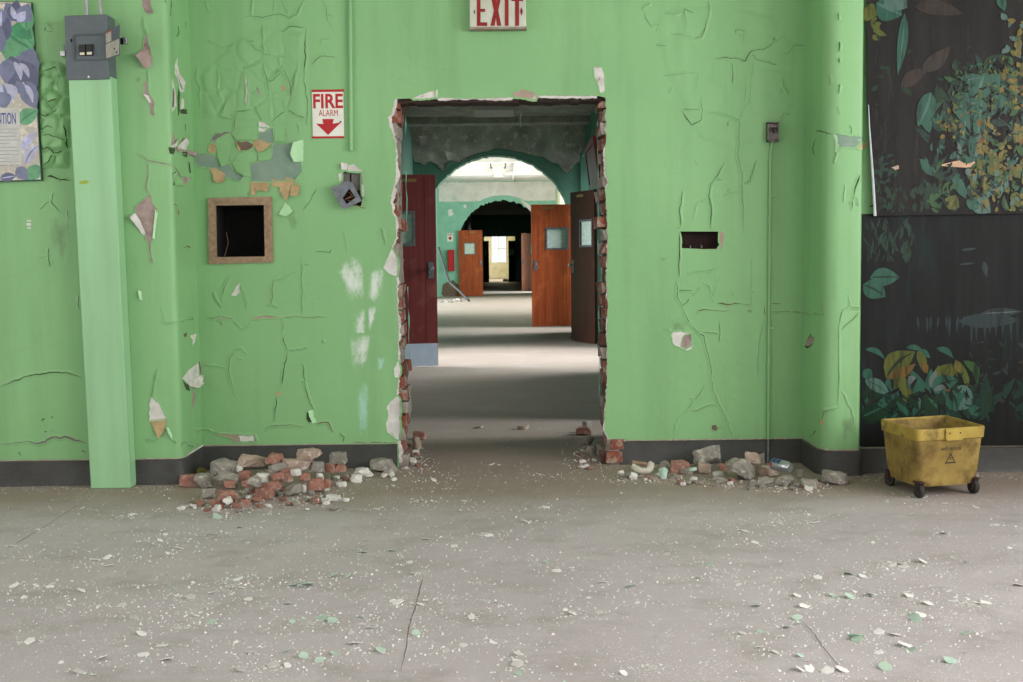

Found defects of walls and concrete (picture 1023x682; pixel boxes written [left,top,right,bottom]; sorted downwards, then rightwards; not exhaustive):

peeling [130,193,159,265]
peeling [167,120,304,216]
crack [217,0,337,135]
spalling [382,247,400,278]
peeling [412,125,585,217]
crack [640,0,784,437]
crack [812,13,861,212]
peeling [181,360,205,414]
crack [212,248,347,443]
water stain [336,255,385,443]
spalling [384,395,403,442]
crack [810,293,860,440]